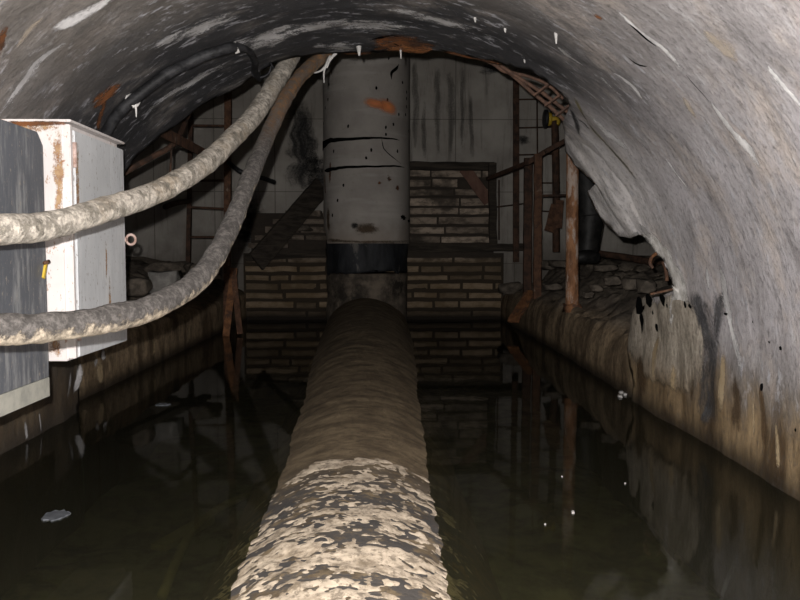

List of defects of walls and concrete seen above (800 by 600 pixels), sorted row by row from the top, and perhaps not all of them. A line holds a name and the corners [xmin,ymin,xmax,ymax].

corrosion [346,35,434,55]
damp [288,107,323,187]
crack [323,137,405,172]
damp [575,101,632,174]
damp [237,199,261,245]
damp [637,224,741,422]